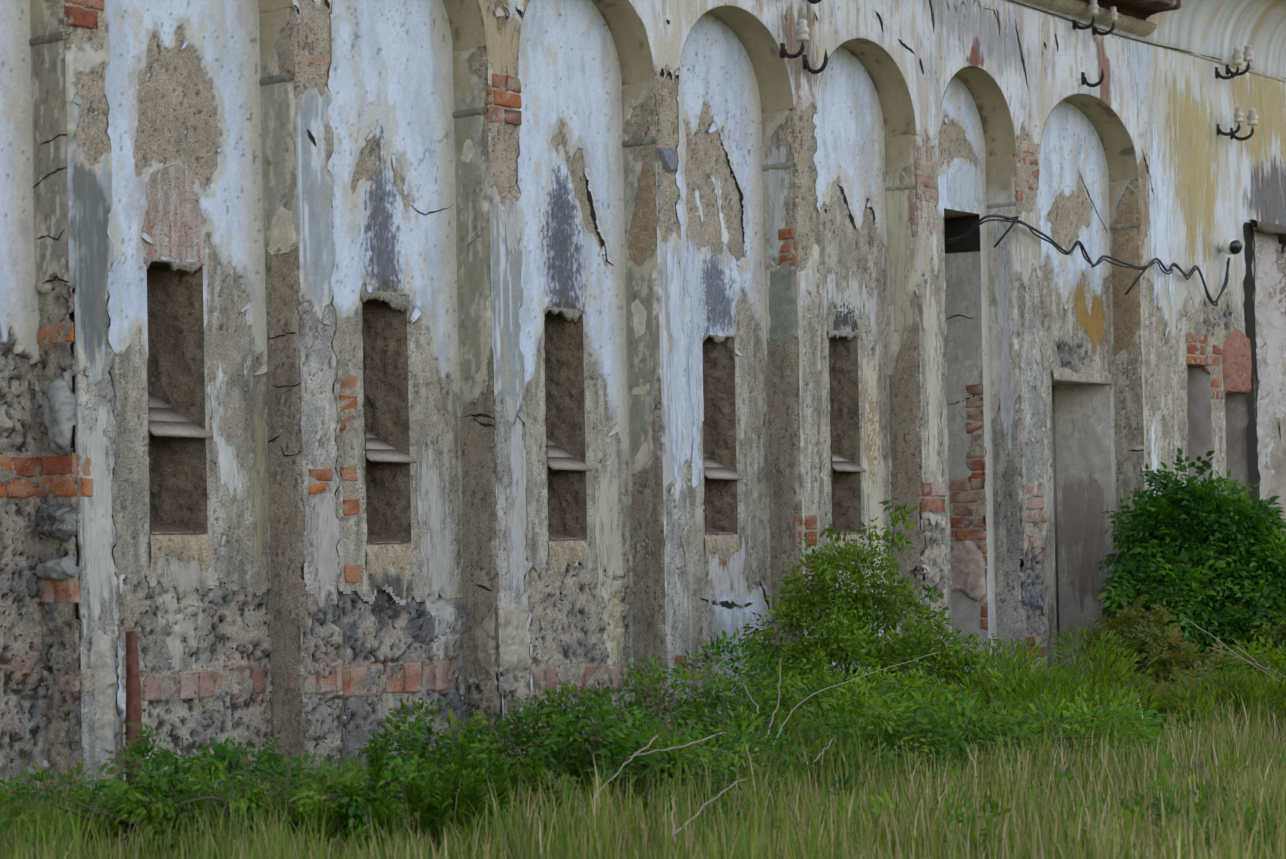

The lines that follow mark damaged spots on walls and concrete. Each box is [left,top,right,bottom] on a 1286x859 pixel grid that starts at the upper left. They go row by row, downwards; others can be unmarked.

flaking render [626,67,746,266]
leakage [1127,37,1151,111]
leakage [1146,73,1219,306]
leakage [1230,69,1286,437]
flaking render [0,0,574,807]
flaking render [531,98,1257,735]
flaking render [1256,412,1286,531]